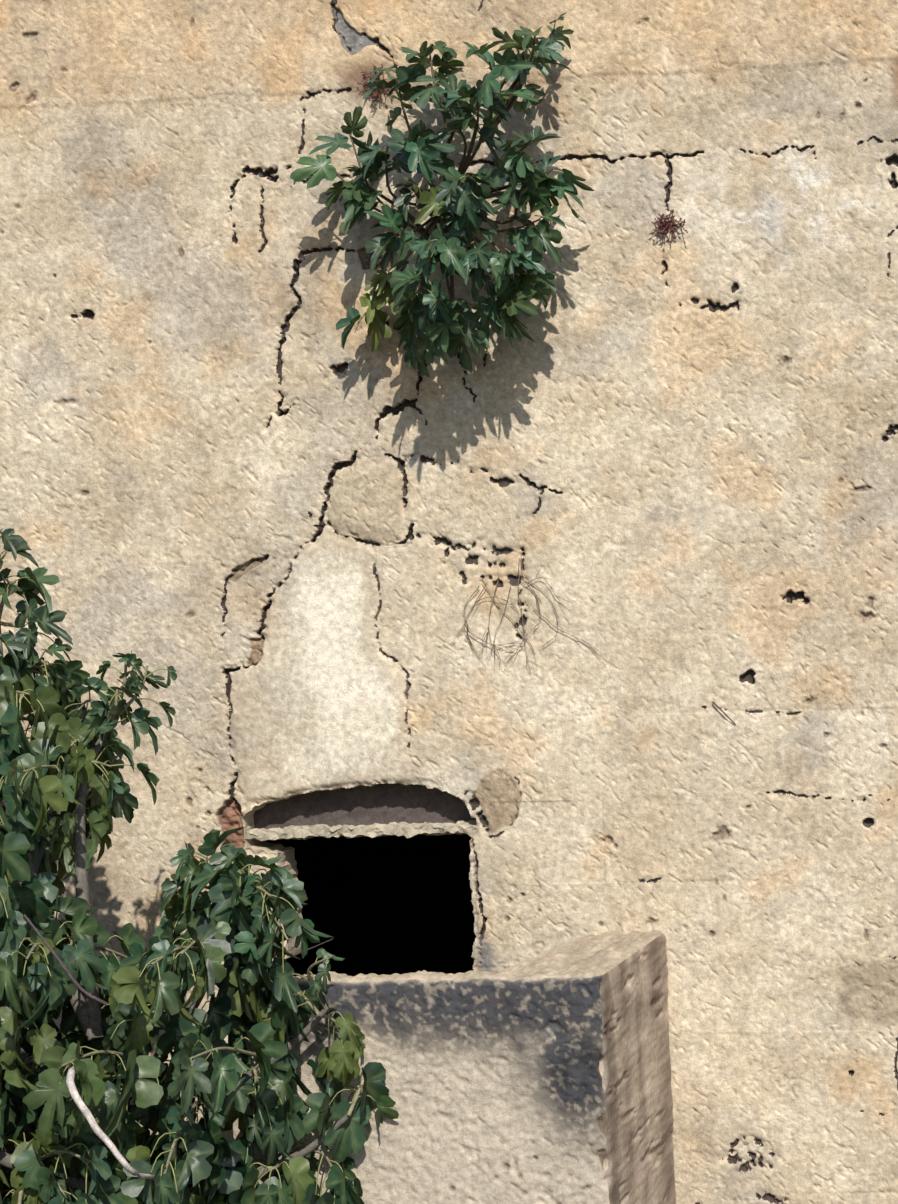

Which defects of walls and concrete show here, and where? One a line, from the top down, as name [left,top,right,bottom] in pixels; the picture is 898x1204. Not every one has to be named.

spalling [332,9,380,55]
crack [330,0,397,69]
crack [228,87,352,253]
crack [458,159,495,167]
crack [530,151,704,209]
crack [740,145,817,159]
crack [857,136,898,145]
crack [660,261,668,286]
crack [266,246,355,428]
crack [519,474,563,514]
crack [220,348,488,799]
crack [860,1038,898,1116]